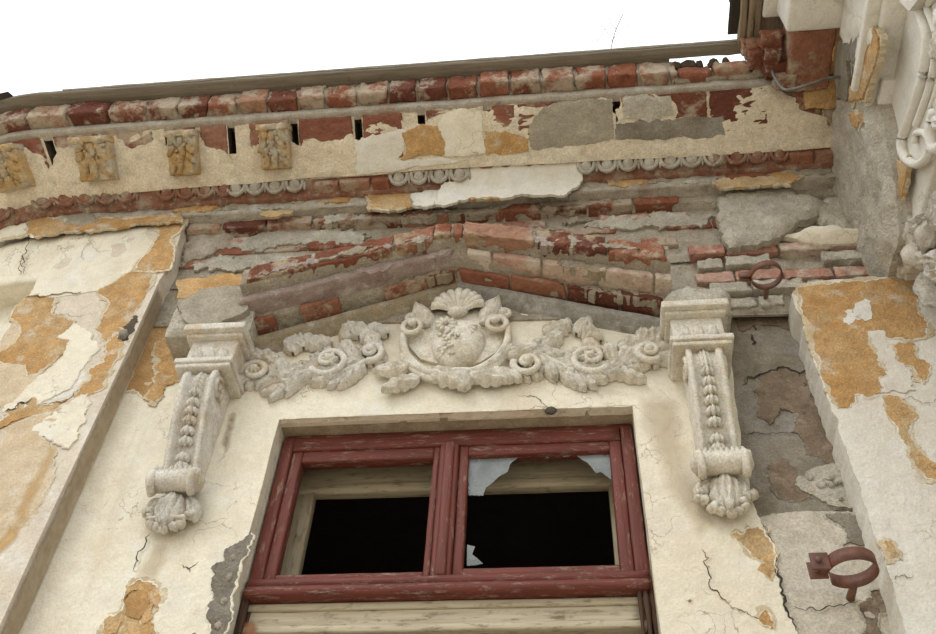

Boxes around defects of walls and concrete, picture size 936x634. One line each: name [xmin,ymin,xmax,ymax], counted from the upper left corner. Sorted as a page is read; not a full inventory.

peeling [802,25,888,131]
peeling [400,124,445,160]
peeling [484,131,529,156]
peeling [365,193,435,214]
flaking render [712,175,851,254]
peeling [0,213,189,564]
crack [743,366,813,397]
peeling [793,276,936,484]
flaking render [752,368,865,547]
peeling [96,576,168,634]
flaking render [205,531,256,634]
crack [702,549,759,619]